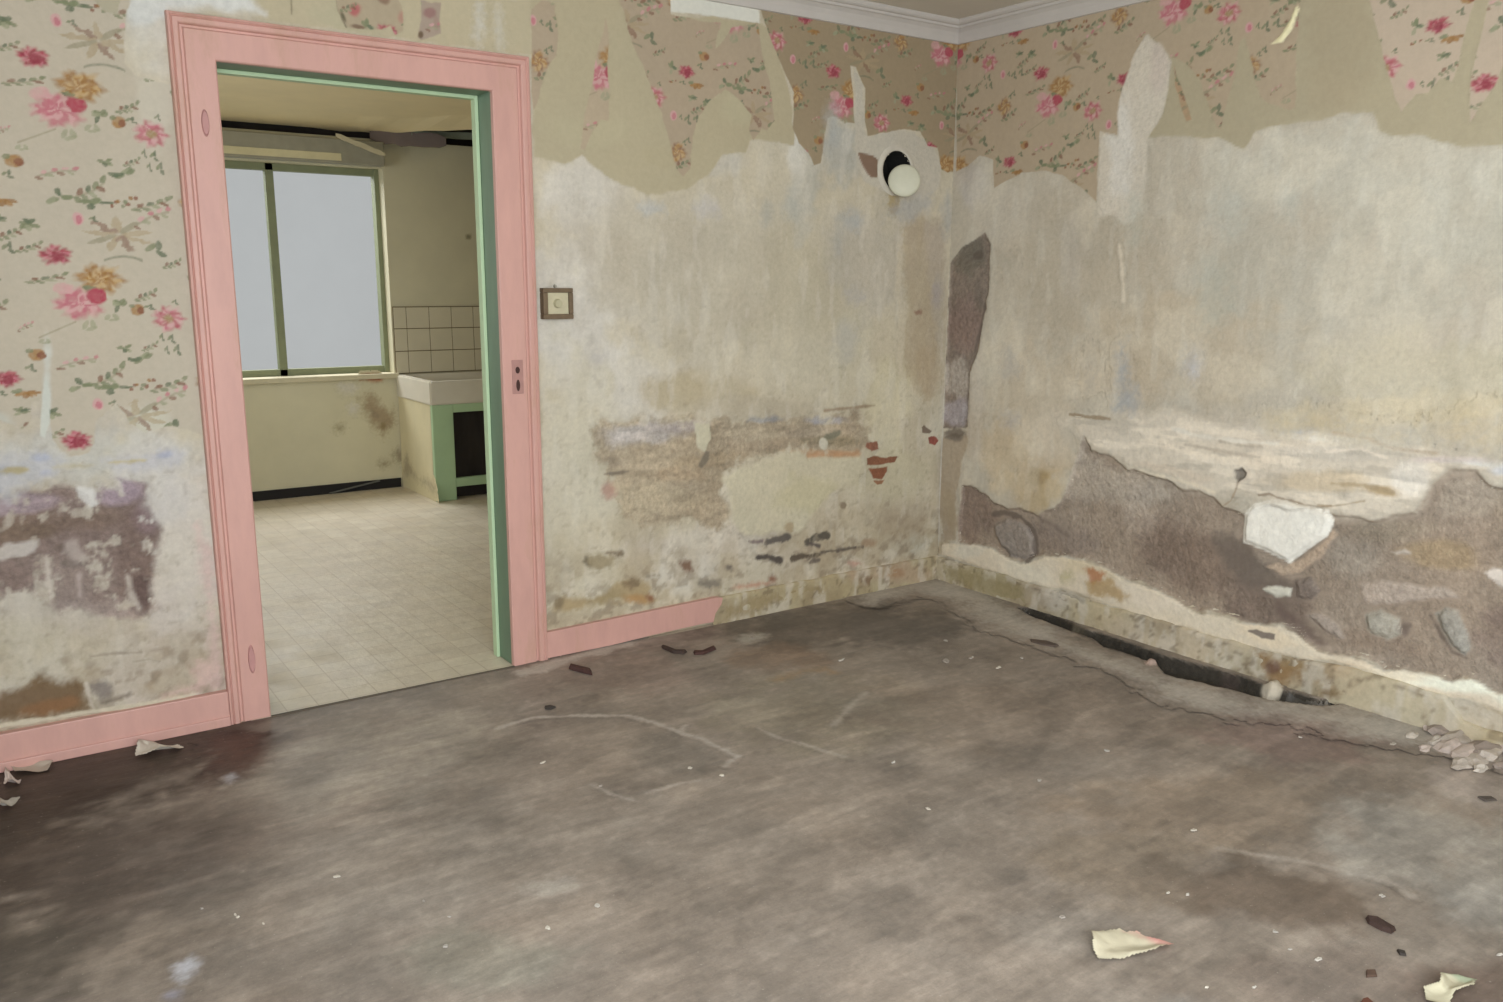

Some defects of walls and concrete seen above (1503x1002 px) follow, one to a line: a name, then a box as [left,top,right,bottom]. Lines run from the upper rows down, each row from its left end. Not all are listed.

flaking render [671,0,761,24]
peeling [1269,4,1301,46]
peeling [857,152,879,180]
peeling [1096,31,1173,220]
spalling [0,476,170,624]
spalling [586,402,898,567]
spalling [921,290,1503,692]